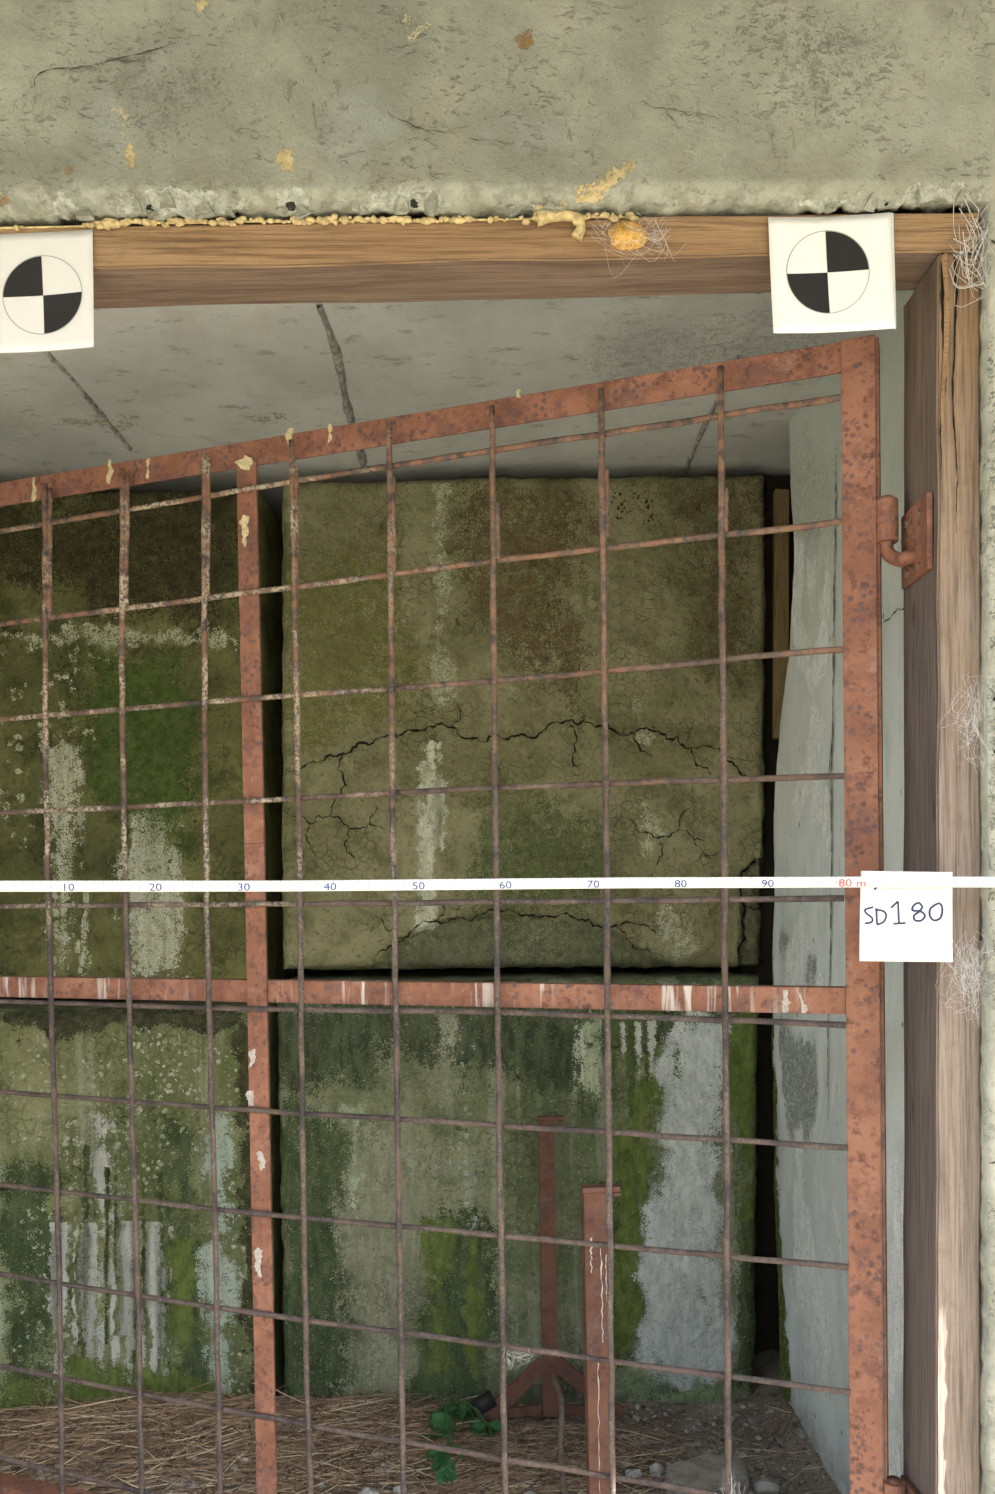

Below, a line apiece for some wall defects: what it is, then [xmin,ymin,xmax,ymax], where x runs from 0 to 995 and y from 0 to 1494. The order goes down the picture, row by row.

water stain [0,490,240,653]
water stain [426,476,616,733]
water stain [655,474,764,685]
water stain [628,698,658,746]
water stain [39,743,90,977]
efflorescence [413,739,452,933]
crack [287,703,764,967]
water stain [637,797,667,863]
efflorescence [648,904,704,964]
water stain [0,1005,255,1395]
water stain [277,1003,716,1402]